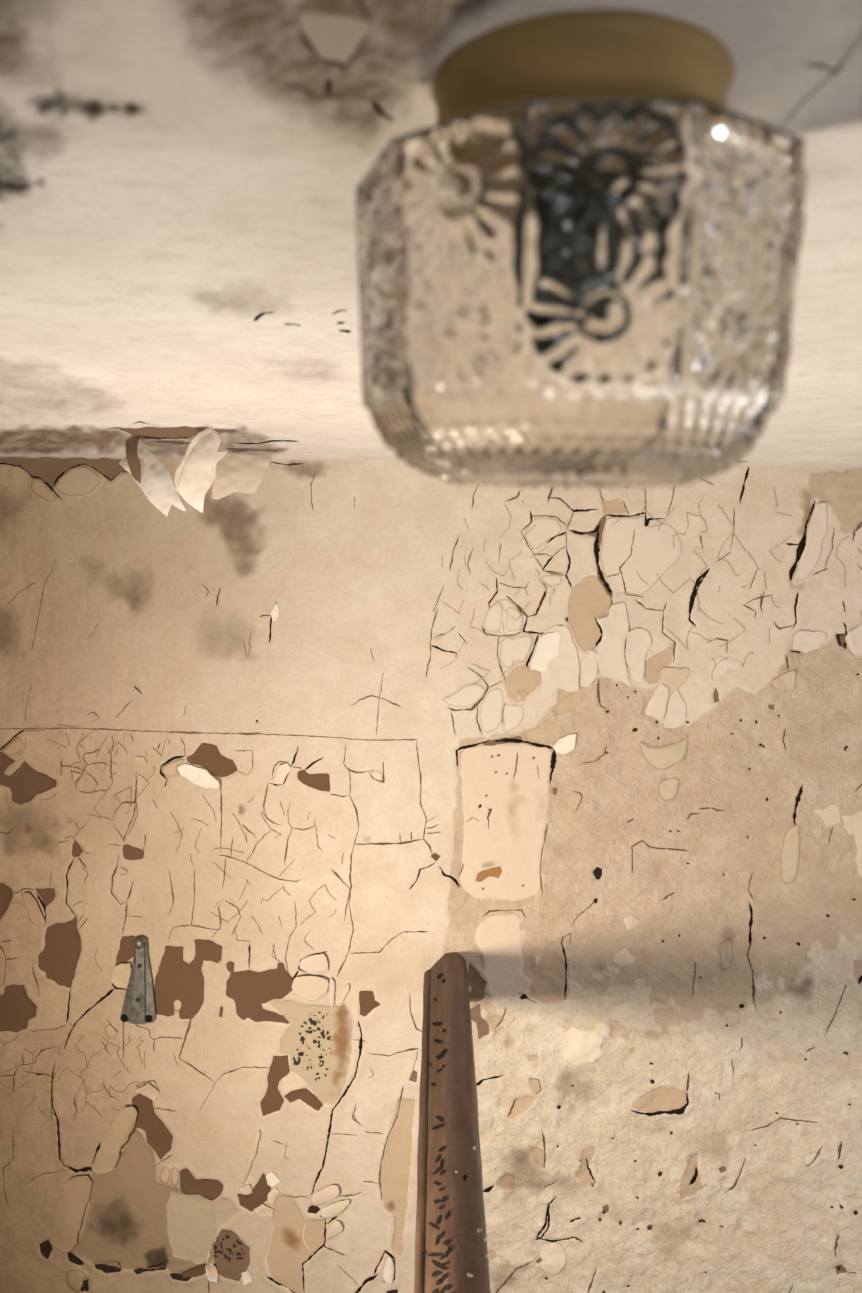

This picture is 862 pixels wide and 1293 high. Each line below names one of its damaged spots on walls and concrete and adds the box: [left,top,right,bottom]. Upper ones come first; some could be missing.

mould [0,173,28,191]
mould [39,96,141,118]
damp [193,0,464,127]
damp [0,427,131,453]
peeling [0,426,271,516]
crack [426,461,749,918]
spalling [504,567,690,740]
crack [742,501,862,670]
spalling [0,883,81,988]
crack [0,649,492,1205]
crack [631,875,757,1116]
spalling [50,935,380,1293]